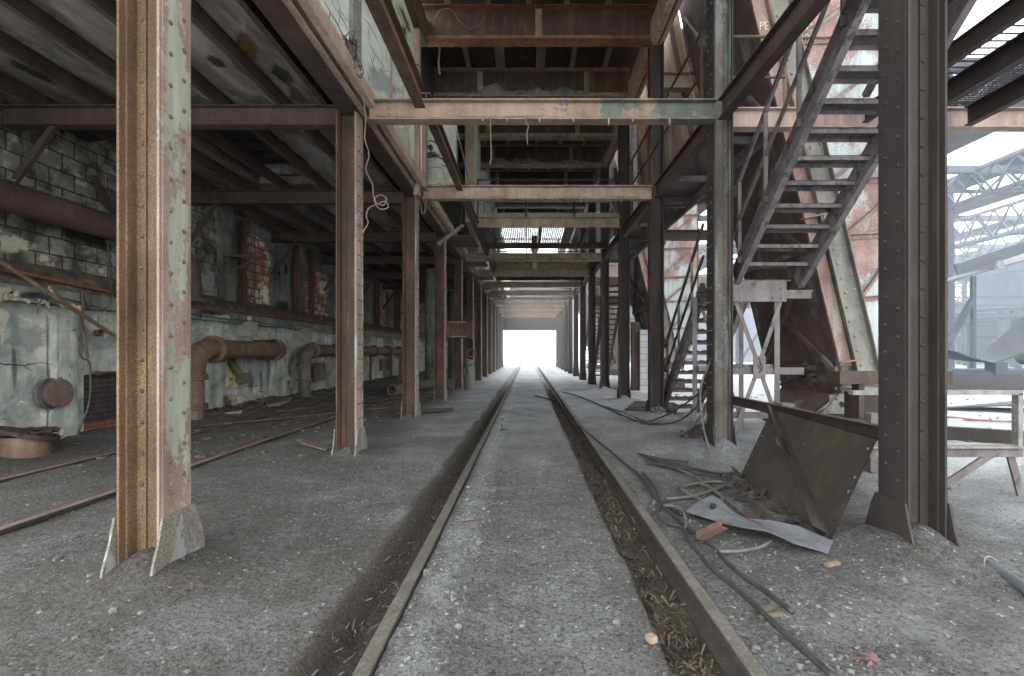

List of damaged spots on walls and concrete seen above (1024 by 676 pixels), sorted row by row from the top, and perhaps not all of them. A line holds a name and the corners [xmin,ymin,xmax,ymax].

peeling [251,281,270,305]
damp [0,308,10,346]